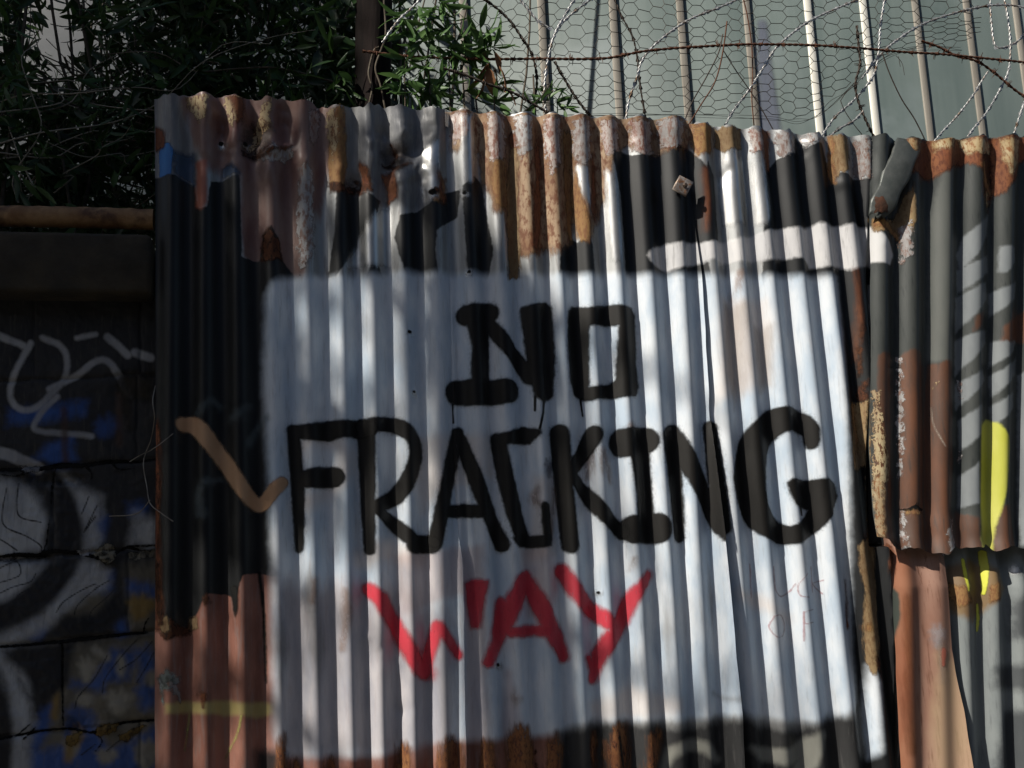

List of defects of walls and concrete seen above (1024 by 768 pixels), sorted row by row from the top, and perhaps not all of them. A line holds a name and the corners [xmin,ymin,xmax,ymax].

corrosion [827,135,836,184]
corrosion [446,109,712,280]
corrosion [868,134,1024,265]
corrosion [260,227,282,262]
corrosion [155,422,164,631]
peeling [851,357,906,674]
peeling [899,510,909,548]
corrosion [948,583,972,607]
corrosion [276,734,300,768]
corrosion [394,742,411,768]
corrosion [436,736,464,768]
corrosion [479,723,564,768]